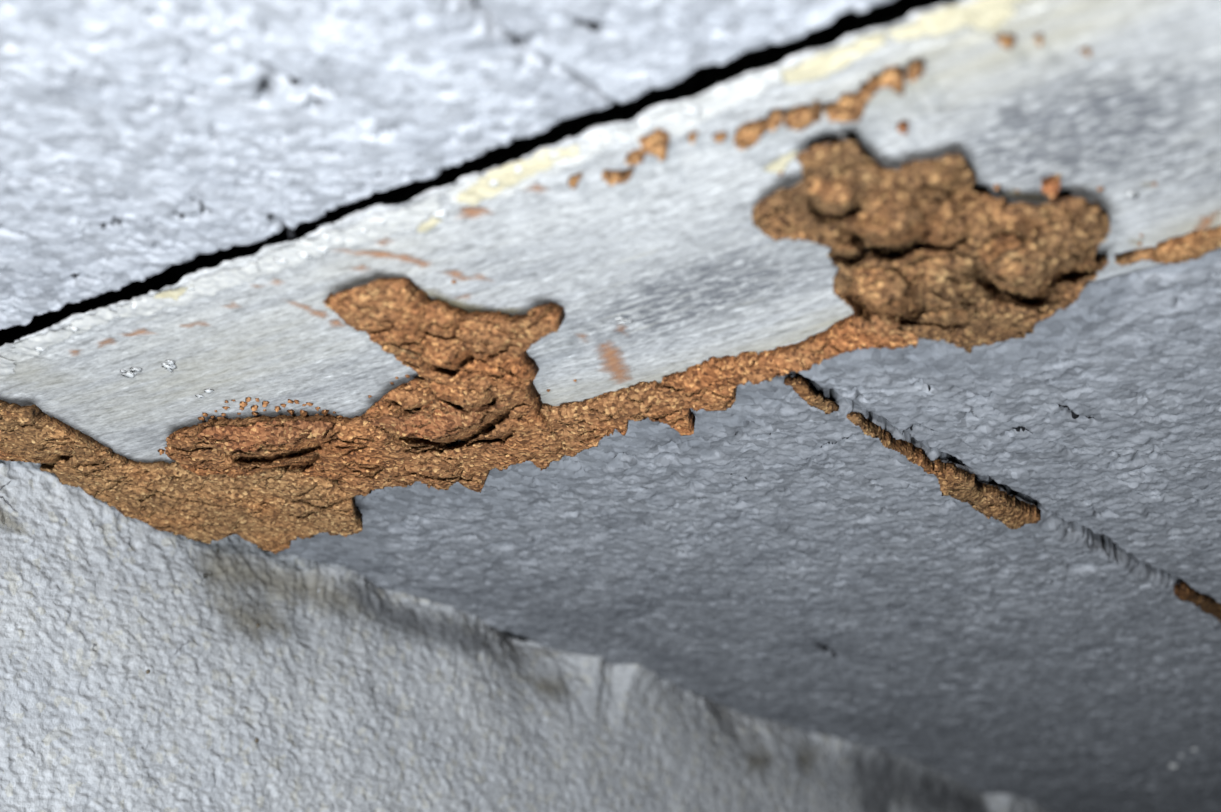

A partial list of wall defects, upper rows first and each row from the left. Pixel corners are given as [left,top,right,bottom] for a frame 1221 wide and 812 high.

crack [574,19,609,32]
crack [507,34,533,48]
crack [239,62,325,107]
crack [173,197,212,219]
crack [98,218,122,229]
crack [267,214,295,239]
crack [1059,404,1094,419]